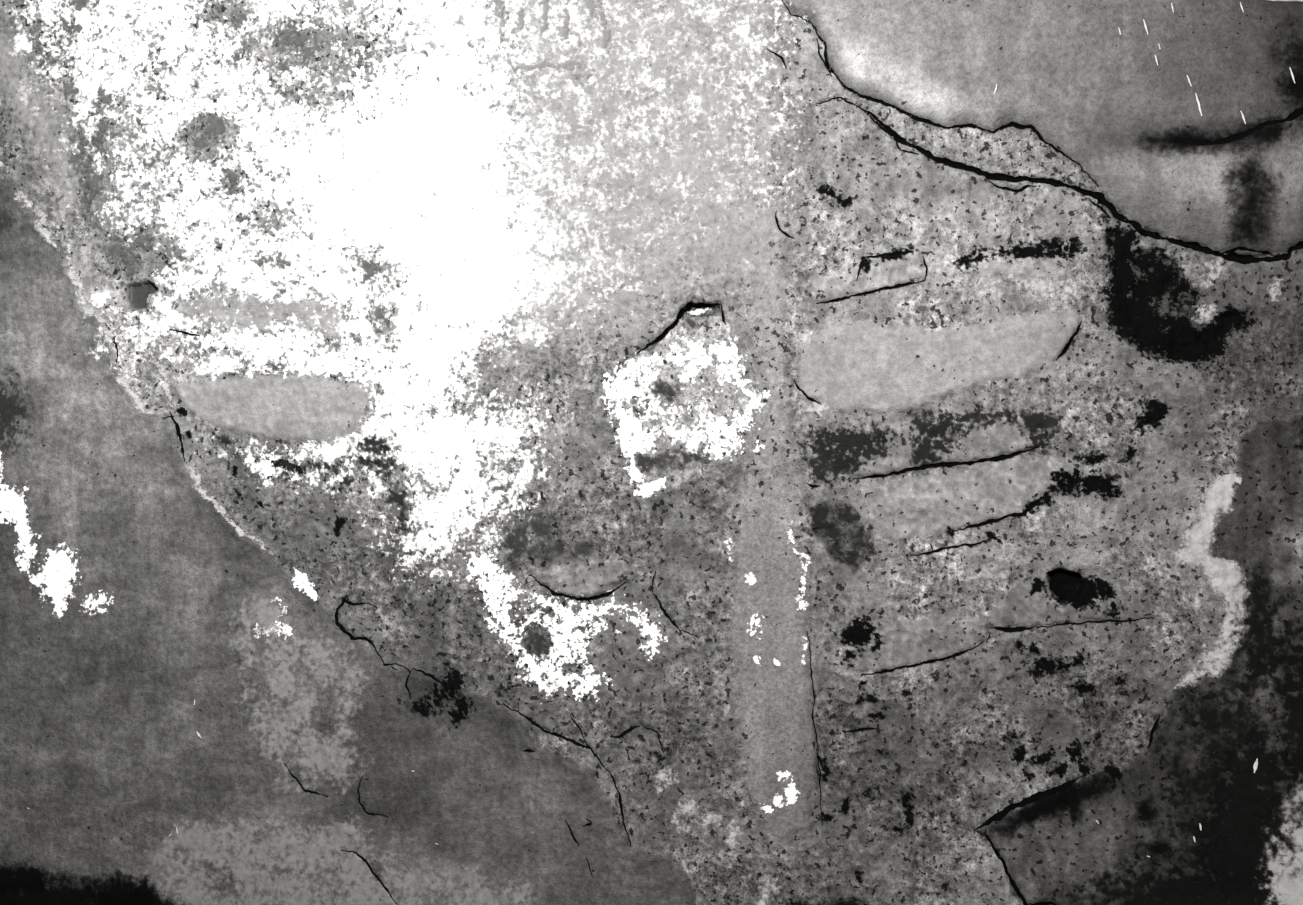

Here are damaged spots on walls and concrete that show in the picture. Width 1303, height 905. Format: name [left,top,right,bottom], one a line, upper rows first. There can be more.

flaking render [450,69,495,104]
crack [782,0,1303,264]
crack [816,250,928,304]
crack [636,302,726,354]
leakage [1155,304,1254,365]
flaking render [837,421,927,479]
crack [852,446,1039,479]
leakage [901,406,1069,468]
flaking render [925,410,1045,464]
flaking render [1030,404,1068,419]
leakage [1052,568,1303,905]
leakage [990,774,1111,837]